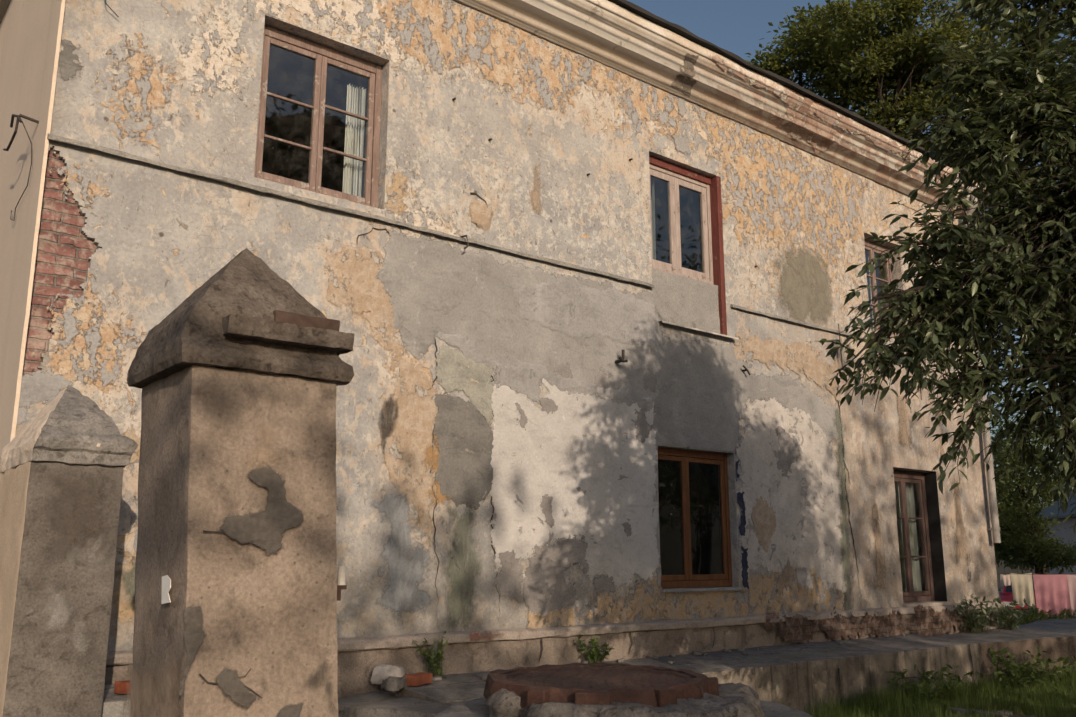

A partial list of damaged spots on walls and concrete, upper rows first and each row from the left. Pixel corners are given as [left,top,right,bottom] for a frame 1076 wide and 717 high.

peeling [93,0,871,275]
flaking render [17,147,145,425]
peeling [112,493,138,634]
peeling [118,424,141,471]
crack [430,424,452,622]
peeling [492,494,986,644]
flaking render [776,426,802,477]